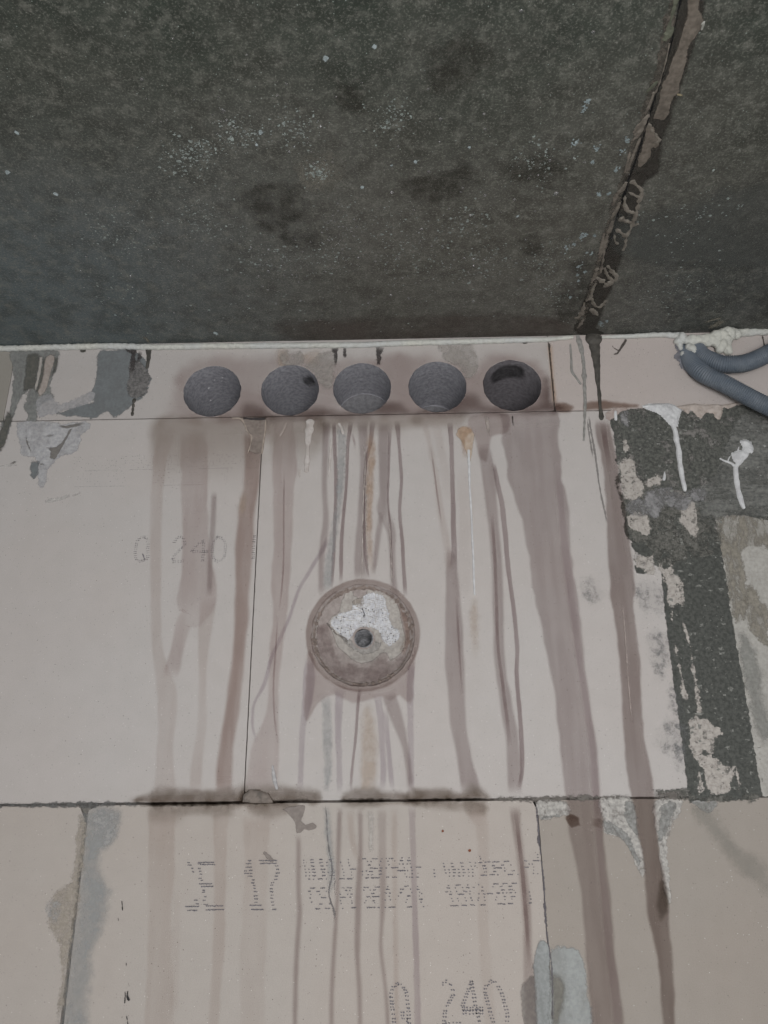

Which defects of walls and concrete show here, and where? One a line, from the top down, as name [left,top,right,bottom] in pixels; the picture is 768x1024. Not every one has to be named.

leakage [280,321,382,388]
leakage [394,316,479,339]
leakage [486,320,543,336]
leakage [556,320,608,441]
peeling [16,421,90,487]
leakage [304,419,315,473]
peeling [618,440,706,537]
peeling [633,555,685,620]
leakage [498,794,620,803]
spalling [598,794,646,877]